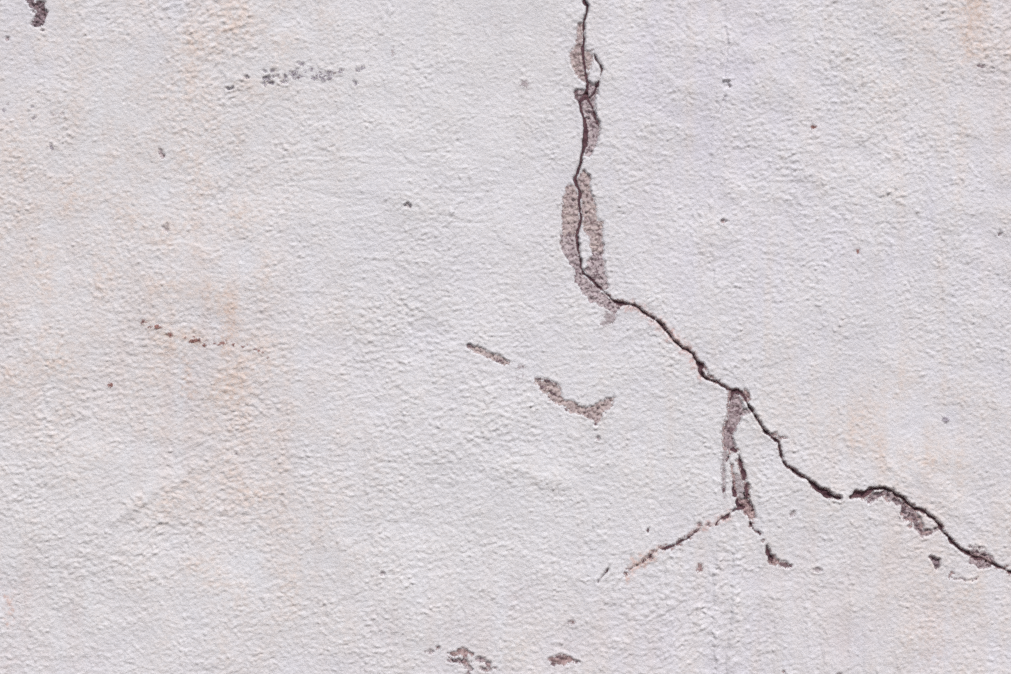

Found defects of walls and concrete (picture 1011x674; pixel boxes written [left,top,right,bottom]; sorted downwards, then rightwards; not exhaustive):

flaking render [25,0,48,31]
crack [573,0,1011,583]
peeling [467,344,616,425]